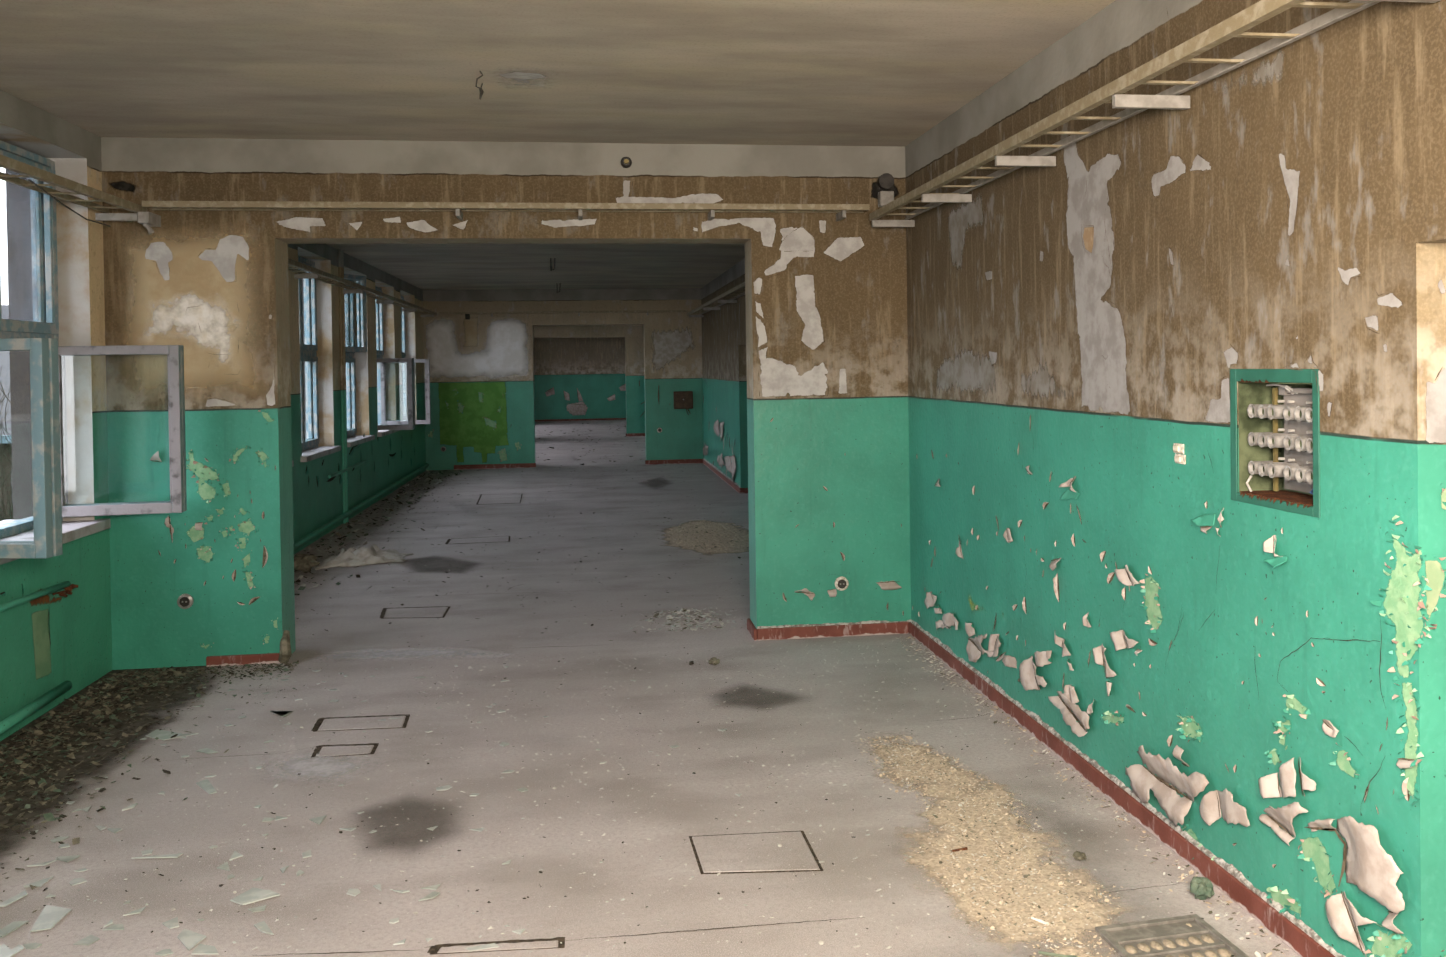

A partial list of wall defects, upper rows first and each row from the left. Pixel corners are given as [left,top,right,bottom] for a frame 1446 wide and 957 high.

flaking render [1150,153,1211,198]
flaking render [1279,153,1300,236]
flaking render [125,233,275,425]
flaking render [427,320,527,430]
flaking render [615,180,864,397]
flaking render [1021,143,1130,429]
flaking render [1203,345,1238,423]
flaking render [1338,267,1403,352]
peeling [158,446,276,605]
peeling [956,474,1086,602]
peeling [1370,515,1446,807]
peeling [757,551,1414,957]